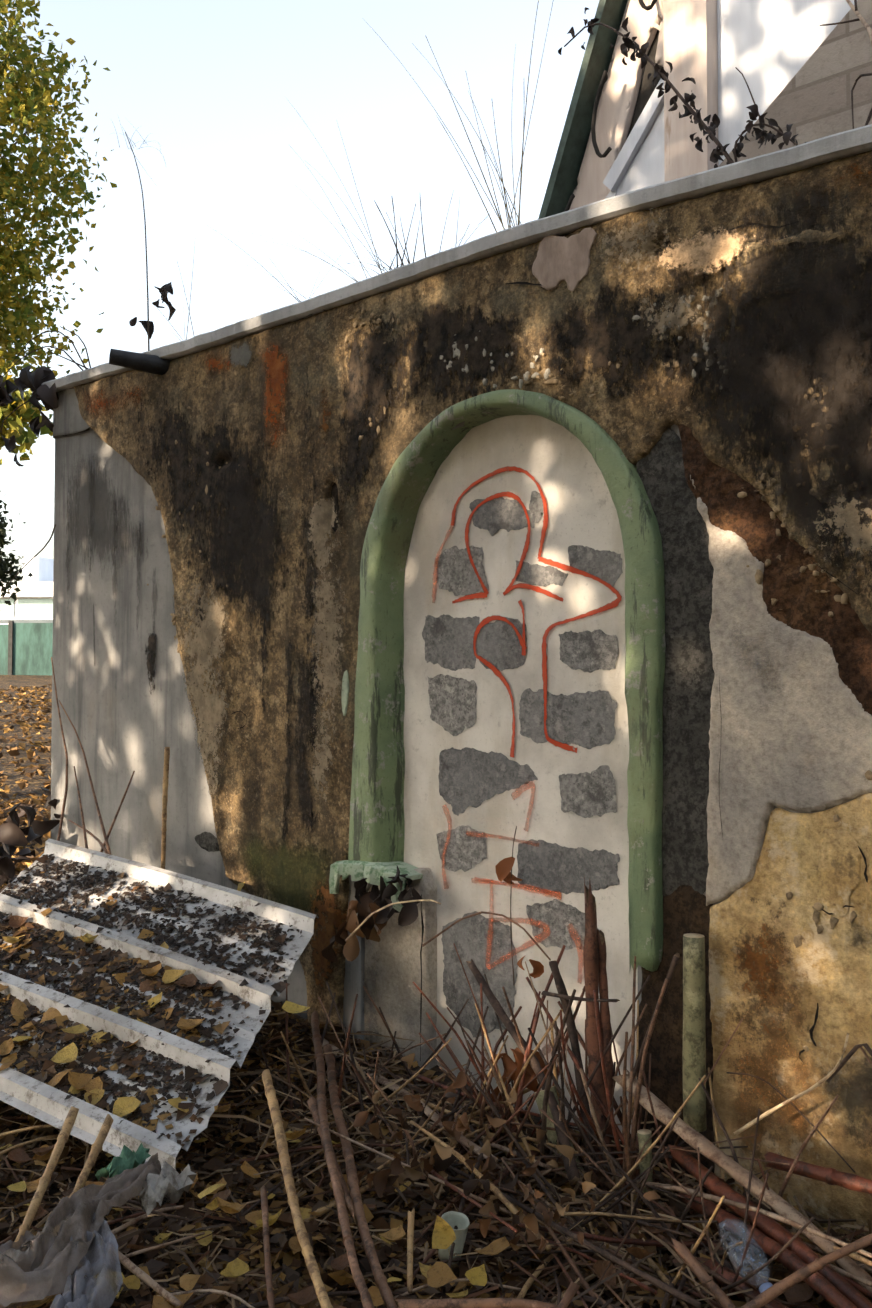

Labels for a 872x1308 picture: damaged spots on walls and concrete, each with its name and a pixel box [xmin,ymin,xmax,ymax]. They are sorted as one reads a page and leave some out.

peeling [532,227,597,292]
rust [262,343,289,453]
peeling [793,377,834,474]
damp [128,189,872,1008]
spalling [636,424,872,1188]
crack [822,846,868,915]